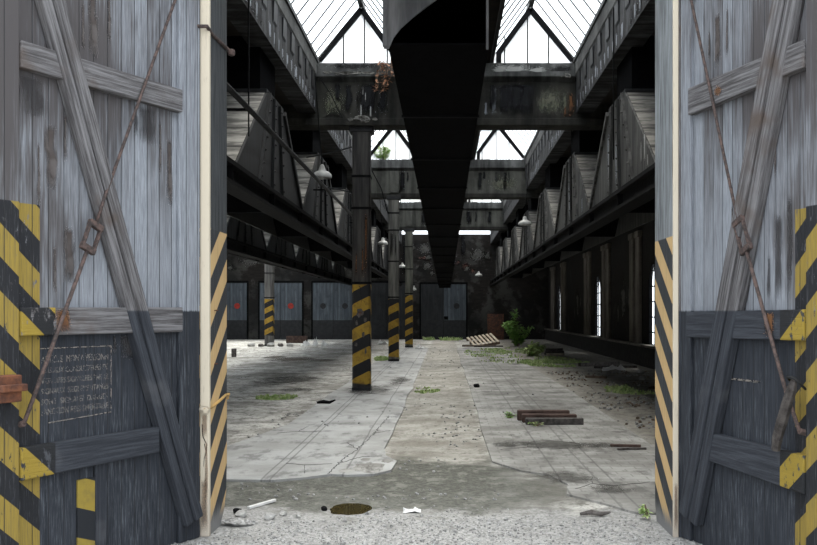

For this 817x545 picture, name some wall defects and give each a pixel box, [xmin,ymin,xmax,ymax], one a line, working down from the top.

crack [286,417,390,473]